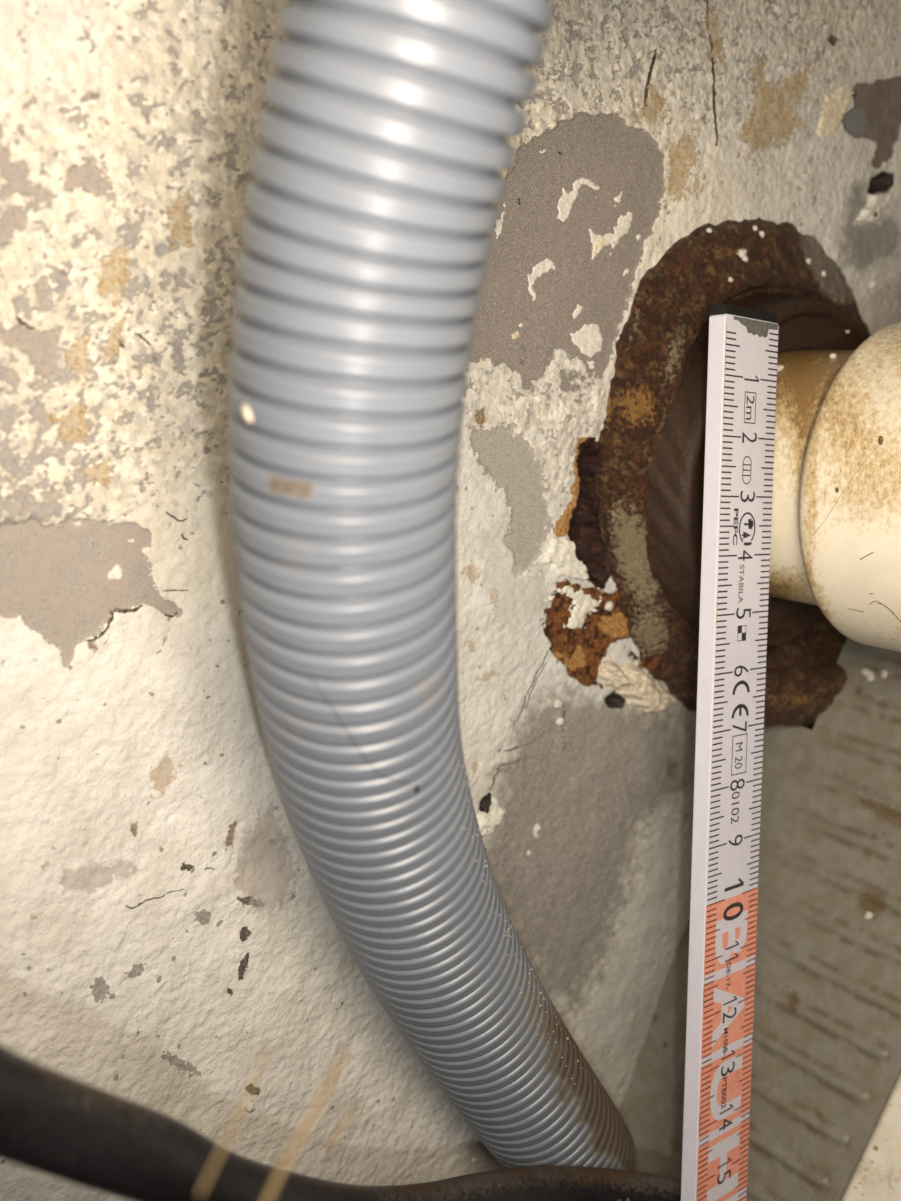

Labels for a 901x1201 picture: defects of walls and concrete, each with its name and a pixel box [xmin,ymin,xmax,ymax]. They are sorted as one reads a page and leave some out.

crack [705,0,718,146]
peeling [816,76,901,225]
peeling [468,111,665,423]
peeling [470,412,614,589]
peeling [0,516,183,668]
rust [542,580,666,689]